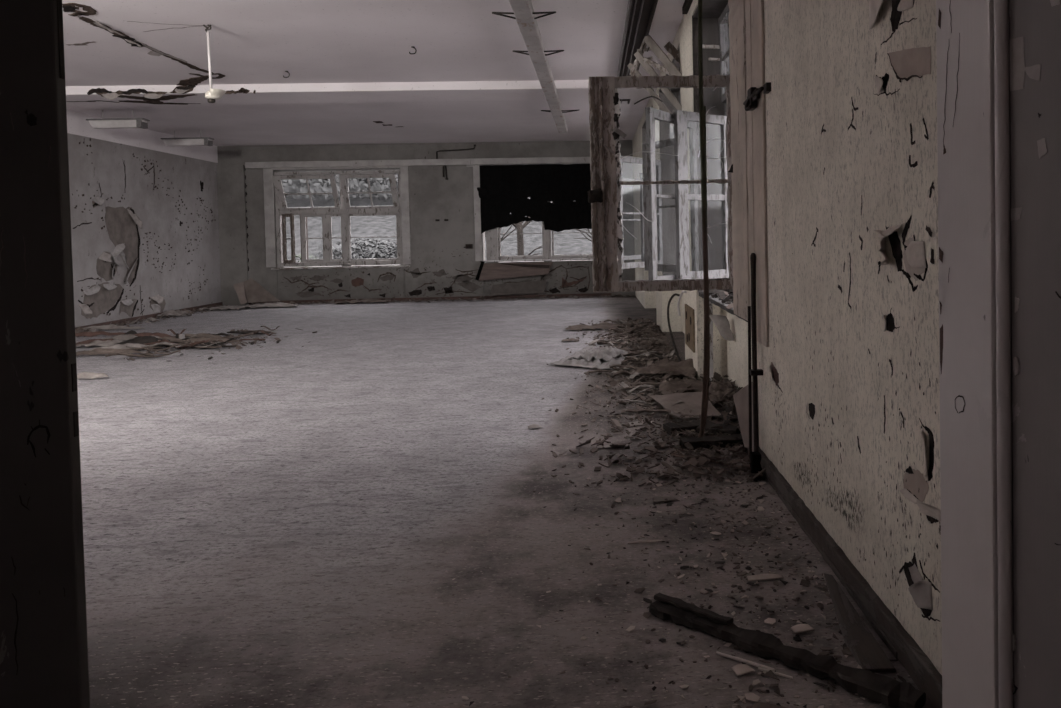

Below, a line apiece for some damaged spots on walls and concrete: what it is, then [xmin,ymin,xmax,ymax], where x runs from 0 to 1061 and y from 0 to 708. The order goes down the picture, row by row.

peeling [87,73,225,105]
crack [821,97,859,135]
peeling [869,0,931,96]
peeling [72,153,216,319]
peeling [281,249,593,298]
spalling [883,308,900,332]
spalling [873,215,943,292]
peeling [919,302,943,395]
peeling [803,401,847,504]
spalling [859,418,941,622]